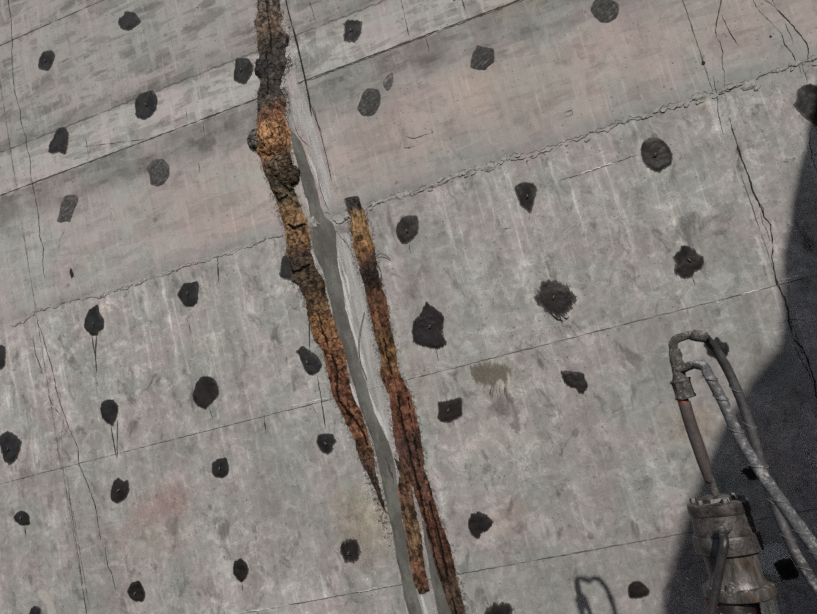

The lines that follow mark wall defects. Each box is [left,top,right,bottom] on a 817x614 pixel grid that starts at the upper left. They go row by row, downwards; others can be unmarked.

crack [33,321,115,587]
rust [247,0,386,513]
rust [344,196,465,614]
crack [713,0,817,397]